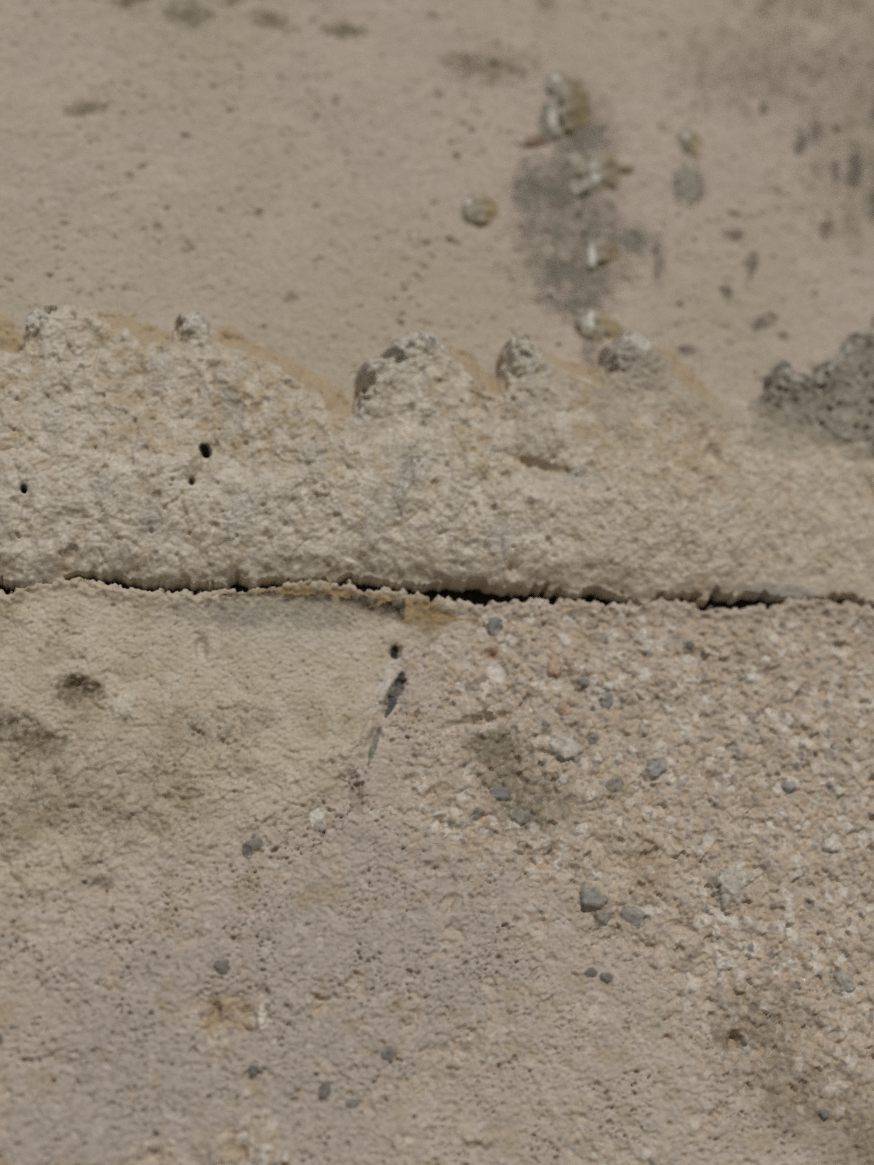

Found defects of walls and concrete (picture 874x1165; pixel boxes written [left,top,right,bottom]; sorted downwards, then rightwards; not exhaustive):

crack [104,582,278,595]
crack [339,582,618,607]
crack [680,596,780,611]